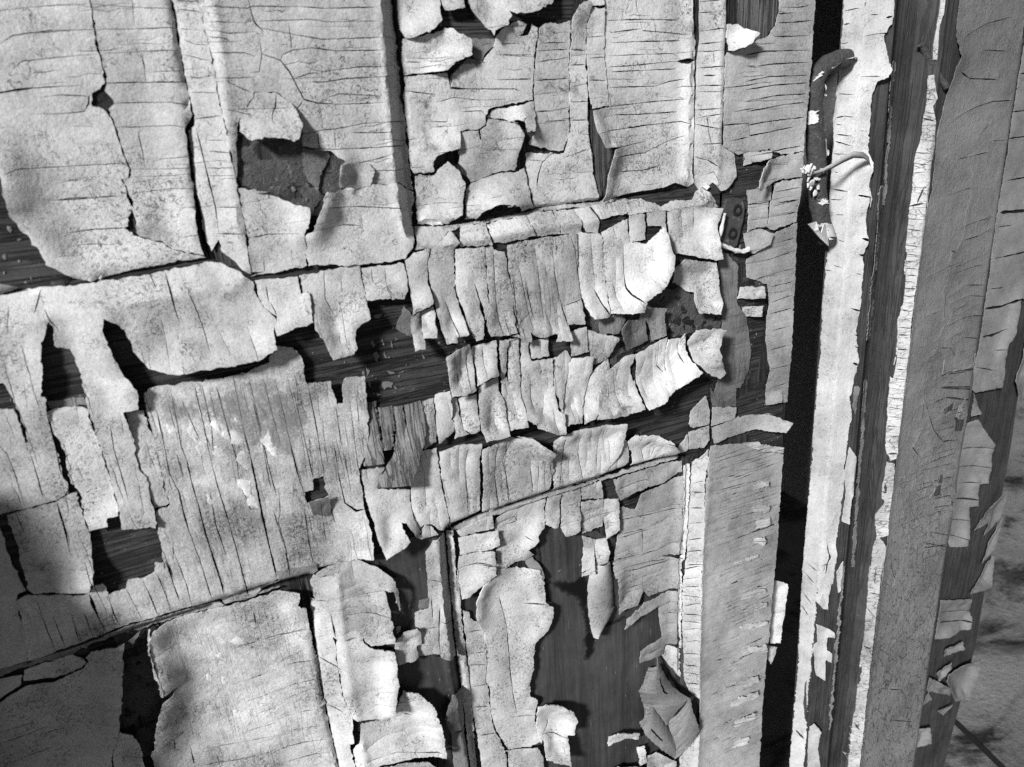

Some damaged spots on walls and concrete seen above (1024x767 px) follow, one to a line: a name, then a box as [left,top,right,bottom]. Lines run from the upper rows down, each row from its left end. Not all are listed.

crack [2,410,83,546]
peeling [92,85,114,112]
crack [40,257,582,643]
peeling [0,92,804,767]
crack [0,0,809,397]
crack [485,598,516,708]
crack [560,507,775,752]
peeling [725,0,779,51]
peeling [807,379,868,767]
peeling [842,61,938,767]
crack [913,349,991,555]
peeling [923,47,1024,716]